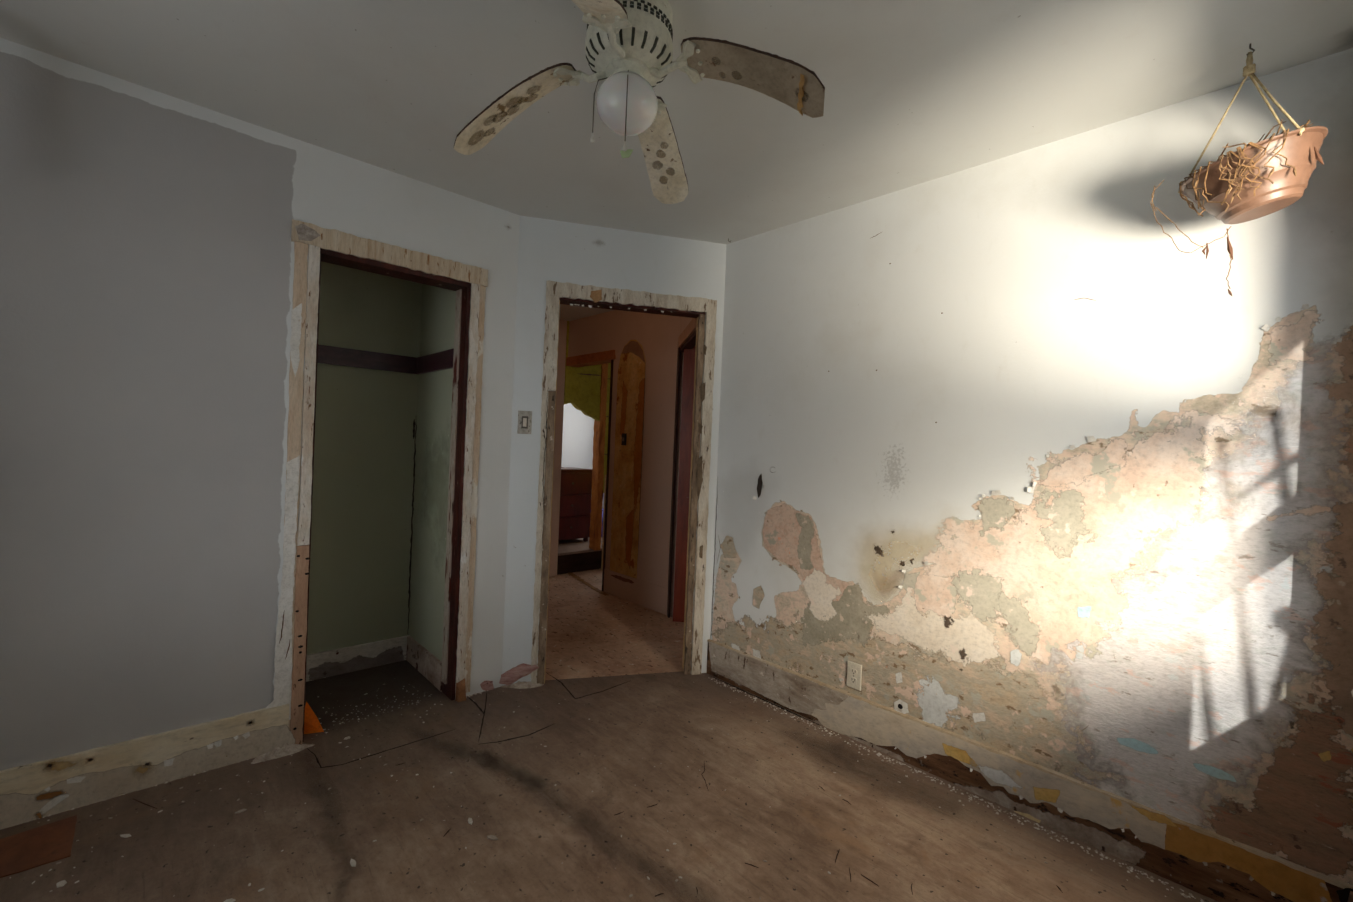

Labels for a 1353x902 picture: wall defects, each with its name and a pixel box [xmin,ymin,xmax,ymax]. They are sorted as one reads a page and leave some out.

spalling [480,663,539,691]
peeling [708,304,1353,902]